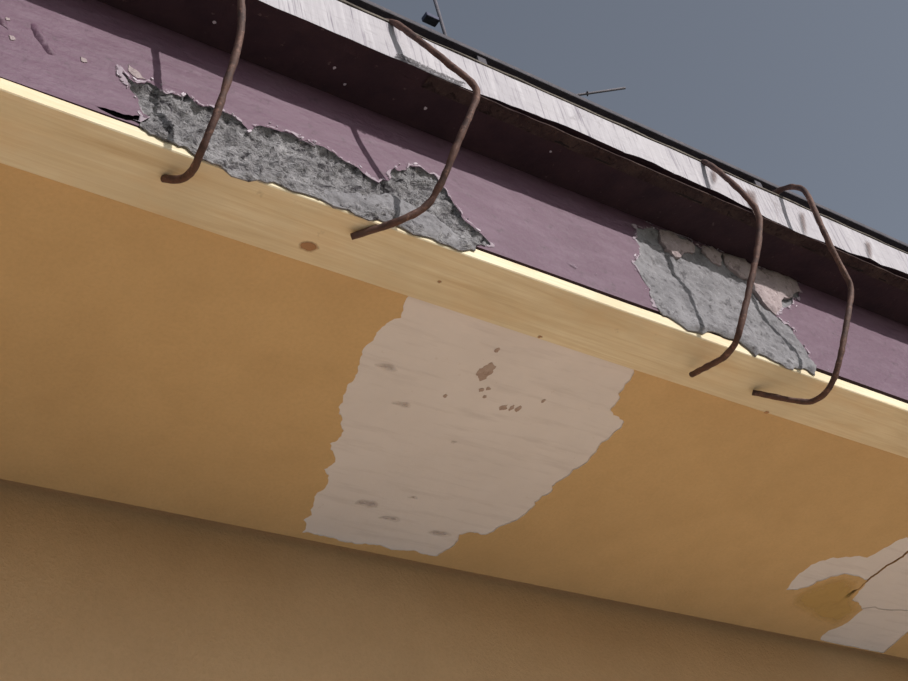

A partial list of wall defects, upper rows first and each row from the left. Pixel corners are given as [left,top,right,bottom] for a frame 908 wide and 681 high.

spalling [103,64,495,251]
spalling [421,74,908,292]
spalling [632,221,816,376]
peeling [302,296,634,556]
peeling [787,537,908,653]
crack [828,551,908,608]